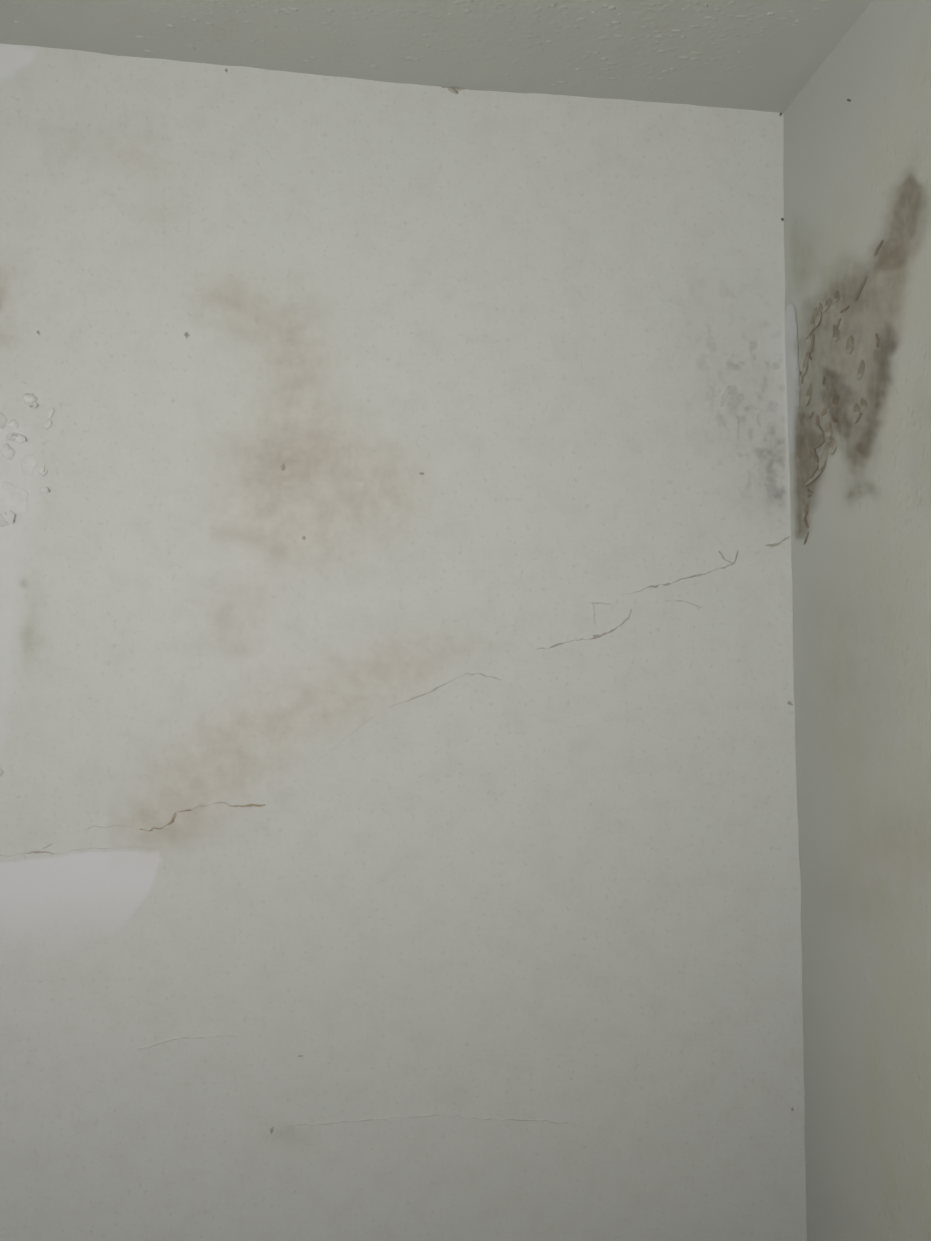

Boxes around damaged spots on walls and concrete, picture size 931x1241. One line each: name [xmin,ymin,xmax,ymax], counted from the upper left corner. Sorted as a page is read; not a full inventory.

crack [535,536,792,650]
crack [0,673,501,857]